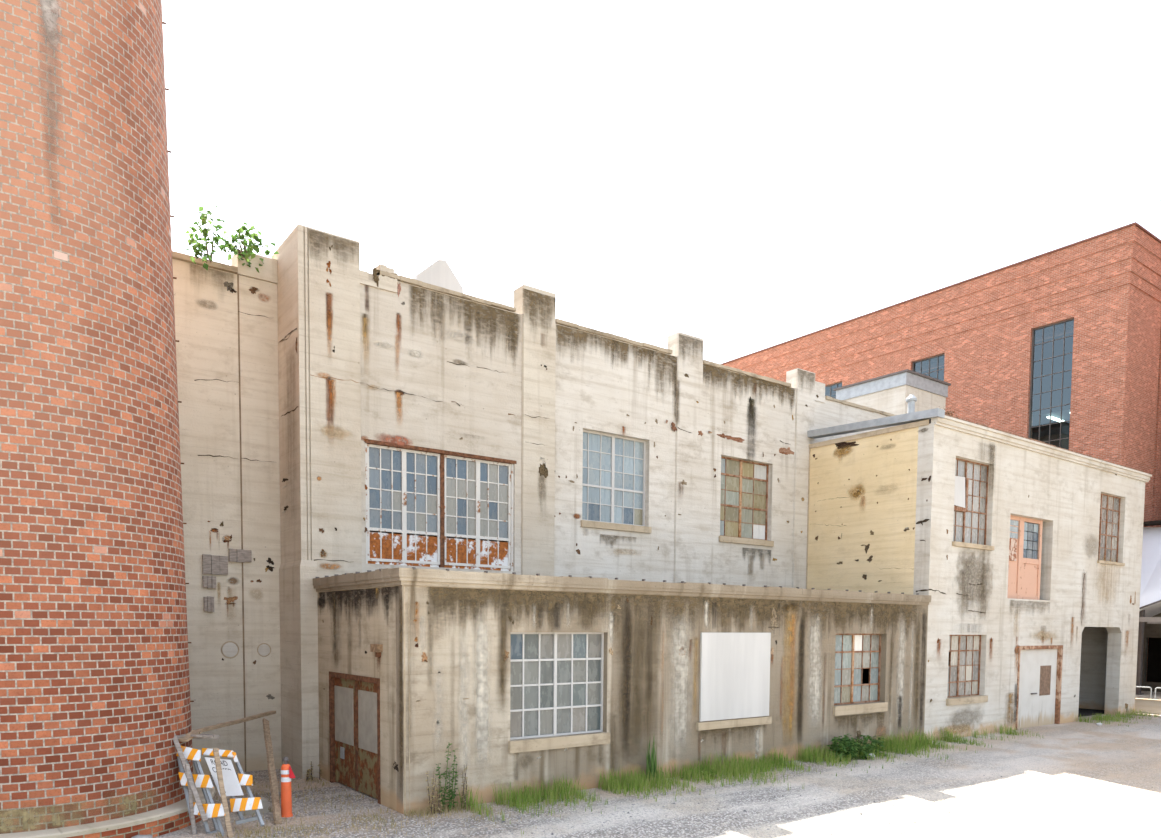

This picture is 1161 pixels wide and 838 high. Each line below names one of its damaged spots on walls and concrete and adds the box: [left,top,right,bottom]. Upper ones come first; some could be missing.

damp [40,0,58,43]
damp [411,286,703,420]
damp [743,547,771,566]
damp [430,587,925,753]
damp [699,726,759,759]